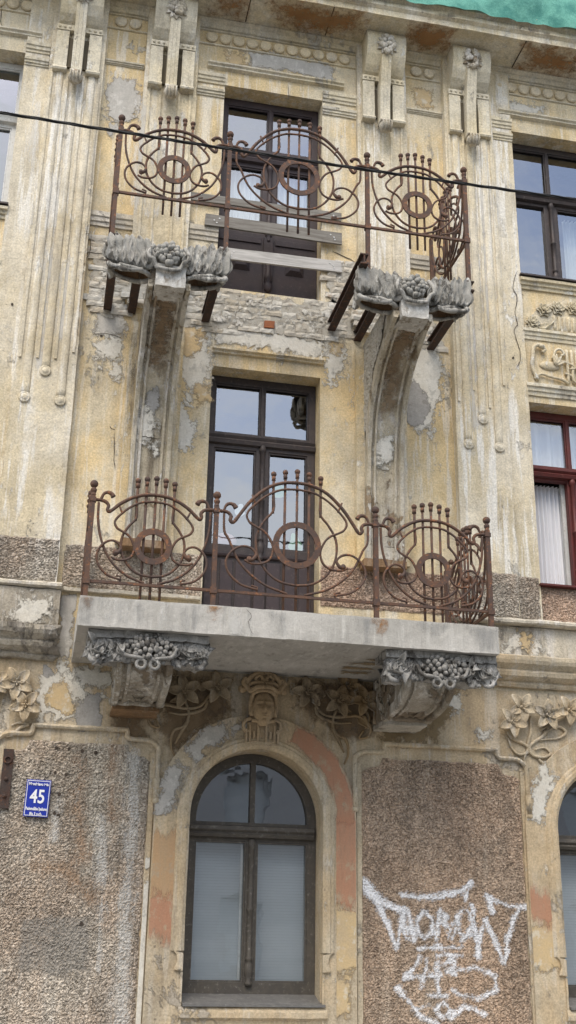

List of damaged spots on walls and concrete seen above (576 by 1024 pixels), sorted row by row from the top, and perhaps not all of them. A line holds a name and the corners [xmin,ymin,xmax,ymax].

flaking render [102,75,159,216]
flaking render [175,114,185,214]
spalling [37,234,147,385]
spalling [130,259,395,474]
flaking render [407,321,450,441]
flaking render [2,589,112,732]
flaking render [153,715,251,816]
flaking render [527,761,560,827]